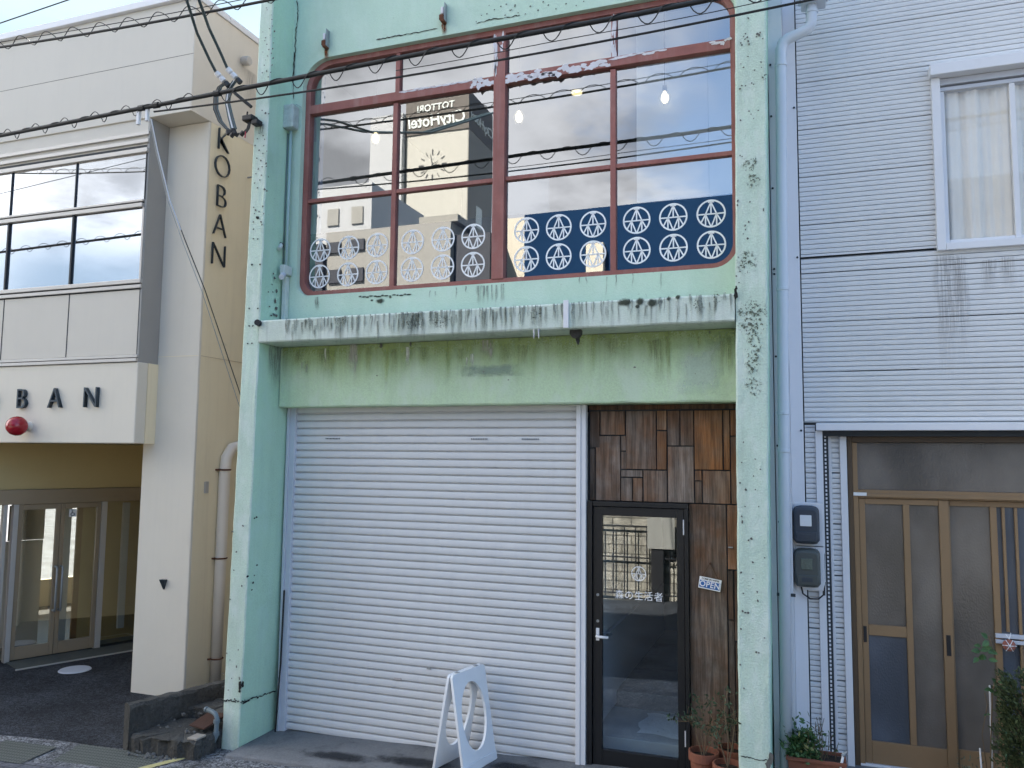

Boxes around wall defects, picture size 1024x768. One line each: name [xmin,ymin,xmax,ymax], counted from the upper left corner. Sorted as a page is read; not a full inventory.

damp [285,284,766,396]
crack [220,691,276,703]